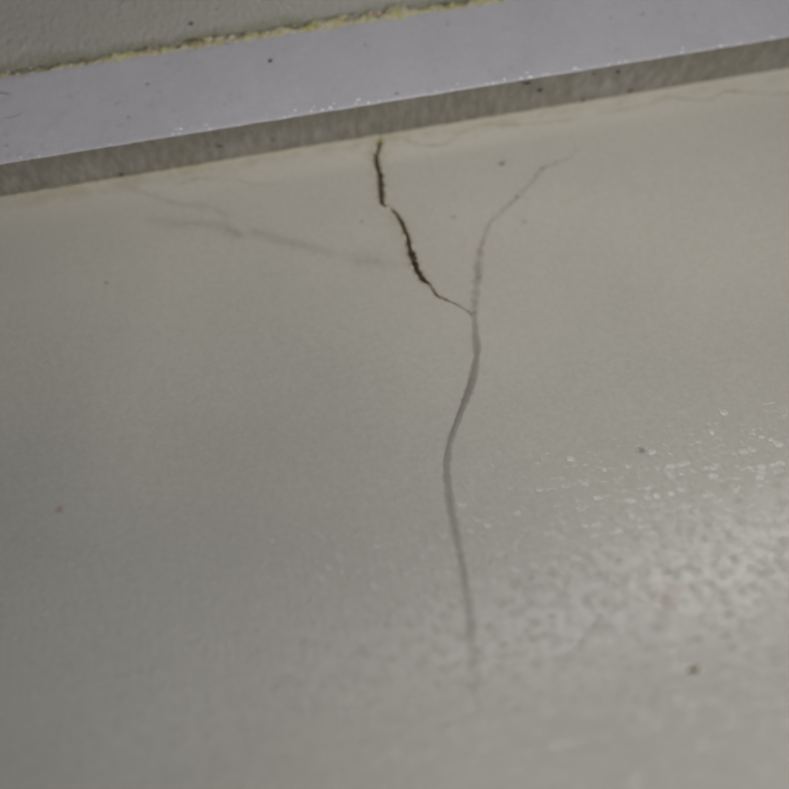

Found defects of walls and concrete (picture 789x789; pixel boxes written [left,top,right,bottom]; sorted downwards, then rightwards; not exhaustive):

crack [374,137,454,302]